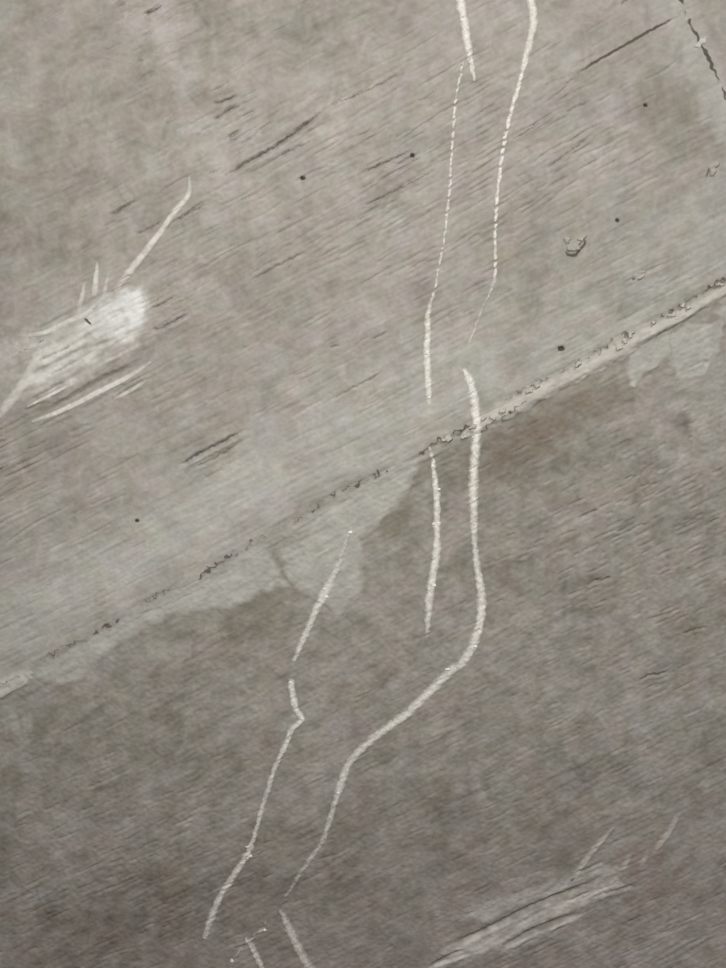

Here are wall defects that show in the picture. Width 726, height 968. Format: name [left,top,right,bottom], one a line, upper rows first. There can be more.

crack [570,0,726,100]
crack [132,68,415,237]
crack [543,127,602,171]
crack [106,197,140,218]
crack [354,164,446,210]
crack [244,247,313,286]
crack [326,368,389,403]
crack [172,425,253,471]
damp [364,368,640,551]
damp [218,588,301,686]